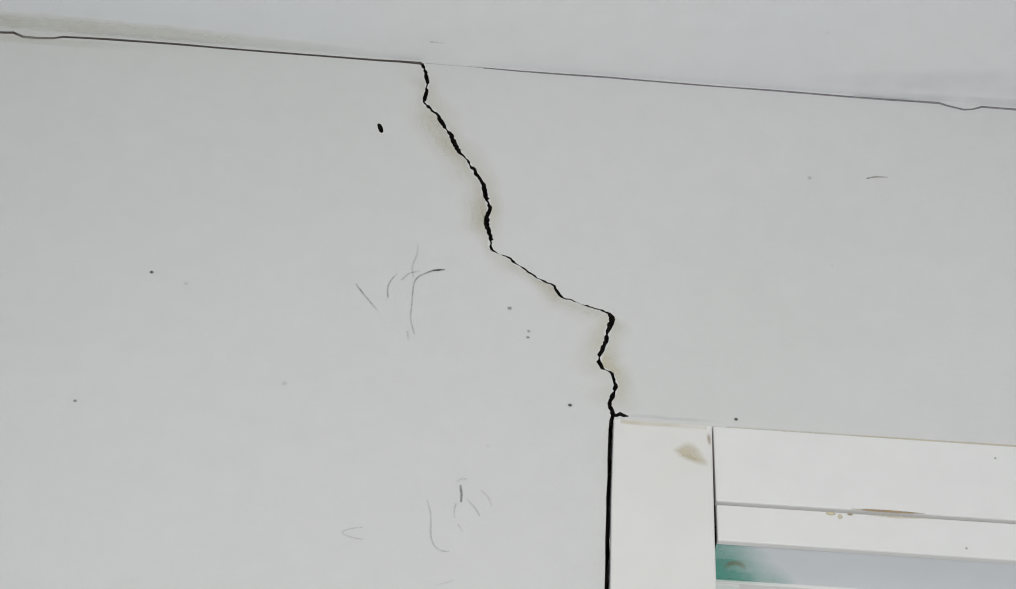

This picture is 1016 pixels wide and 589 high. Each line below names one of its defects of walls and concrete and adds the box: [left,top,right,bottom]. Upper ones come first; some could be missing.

crack [0,31,628,589]